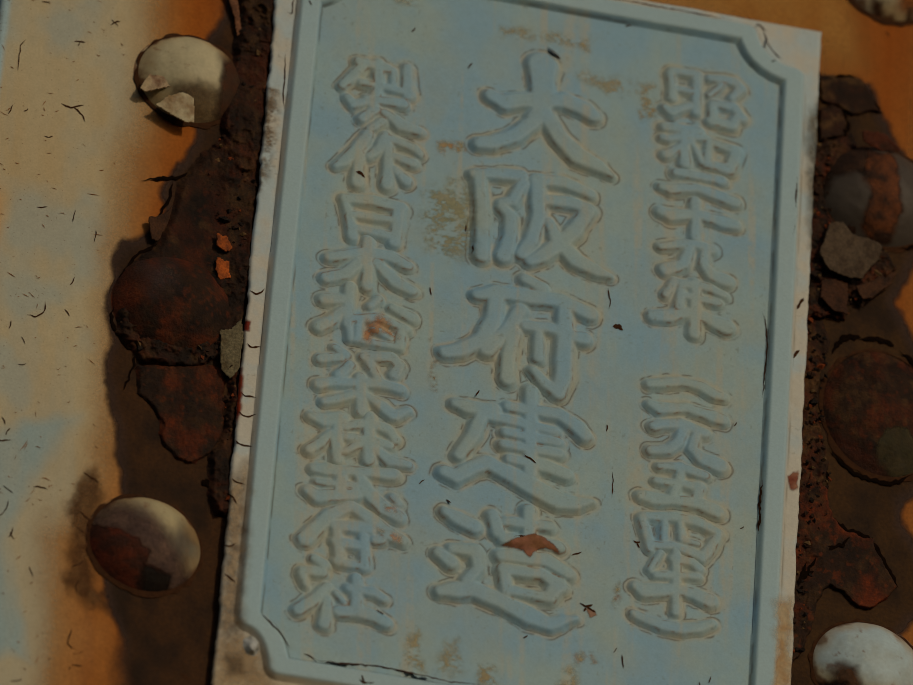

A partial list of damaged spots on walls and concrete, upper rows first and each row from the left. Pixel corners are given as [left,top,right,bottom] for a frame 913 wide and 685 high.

corrosion [45,0,274,685]
corrosion [686,0,913,685]